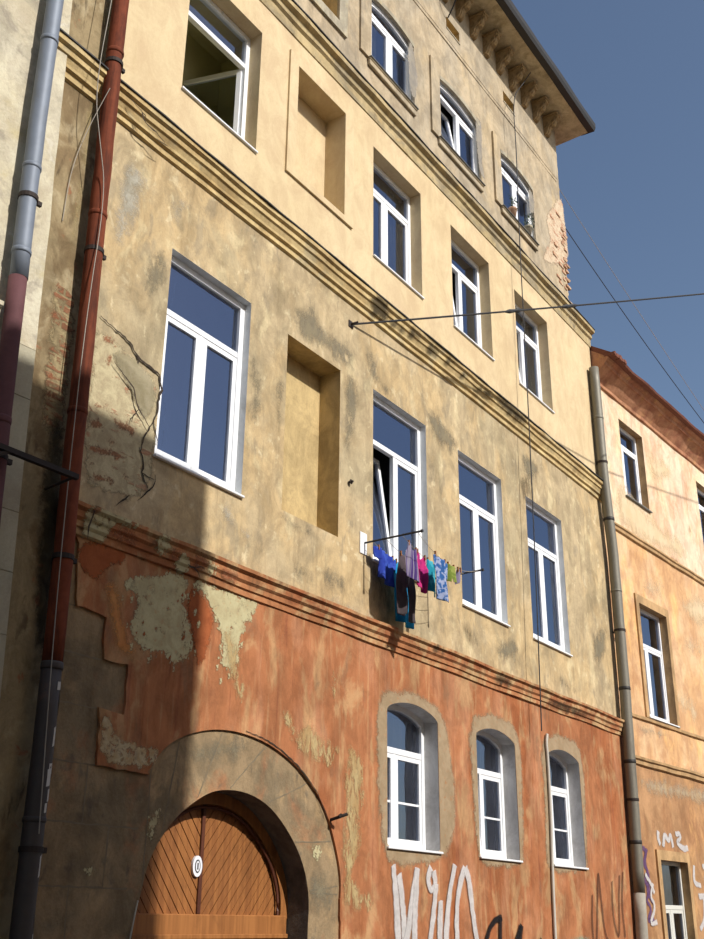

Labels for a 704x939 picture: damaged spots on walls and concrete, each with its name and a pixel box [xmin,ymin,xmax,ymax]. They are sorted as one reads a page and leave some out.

spalling [543,198,573,304]
spalling [43,283,75,432]
spalling [84,330,157,500]
crack [87,316,163,539]
spalling [81,504,142,545]
peeling [121,534,259,703]
peeling [100,716,159,769]
peeling [285,712,371,911]